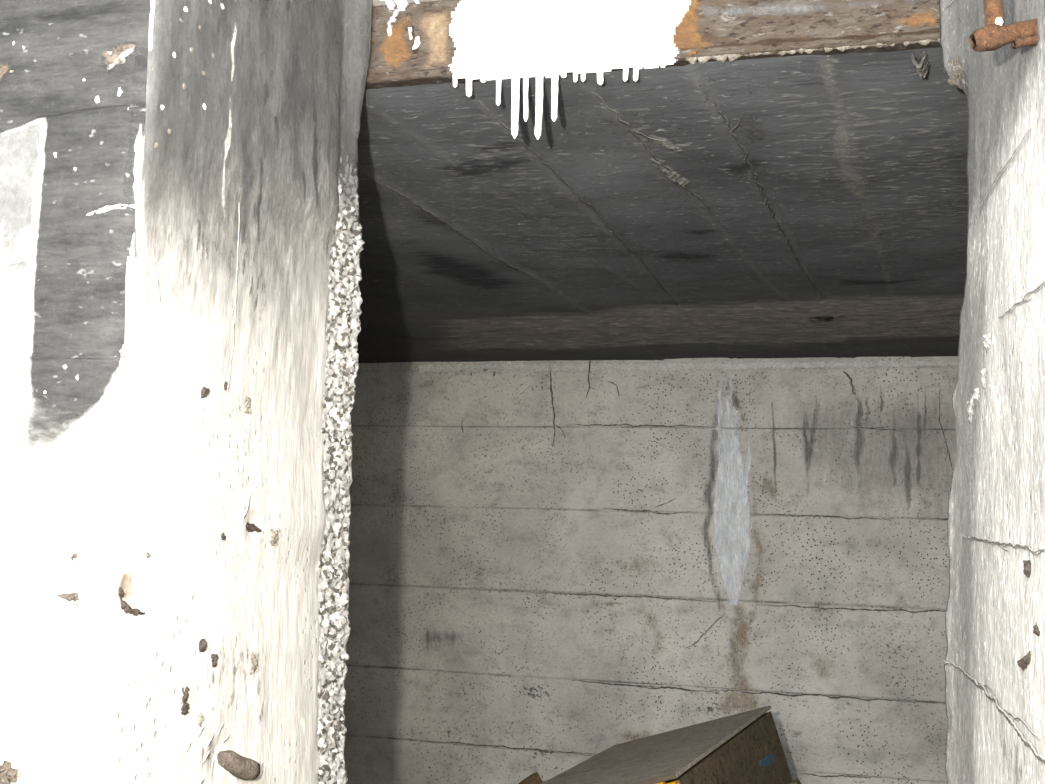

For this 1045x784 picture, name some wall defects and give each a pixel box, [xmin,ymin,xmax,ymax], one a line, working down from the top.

spalling [408,25,420,51]
crack [591,91,716,216]
crack [700,84,822,297]
crack [998,281,1045,318]
crack [549,360,712,447]
water stain [418,360,958,607]
crack [928,516,1045,555]
crack [943,661,1045,764]
spalling [0,761,23,784]